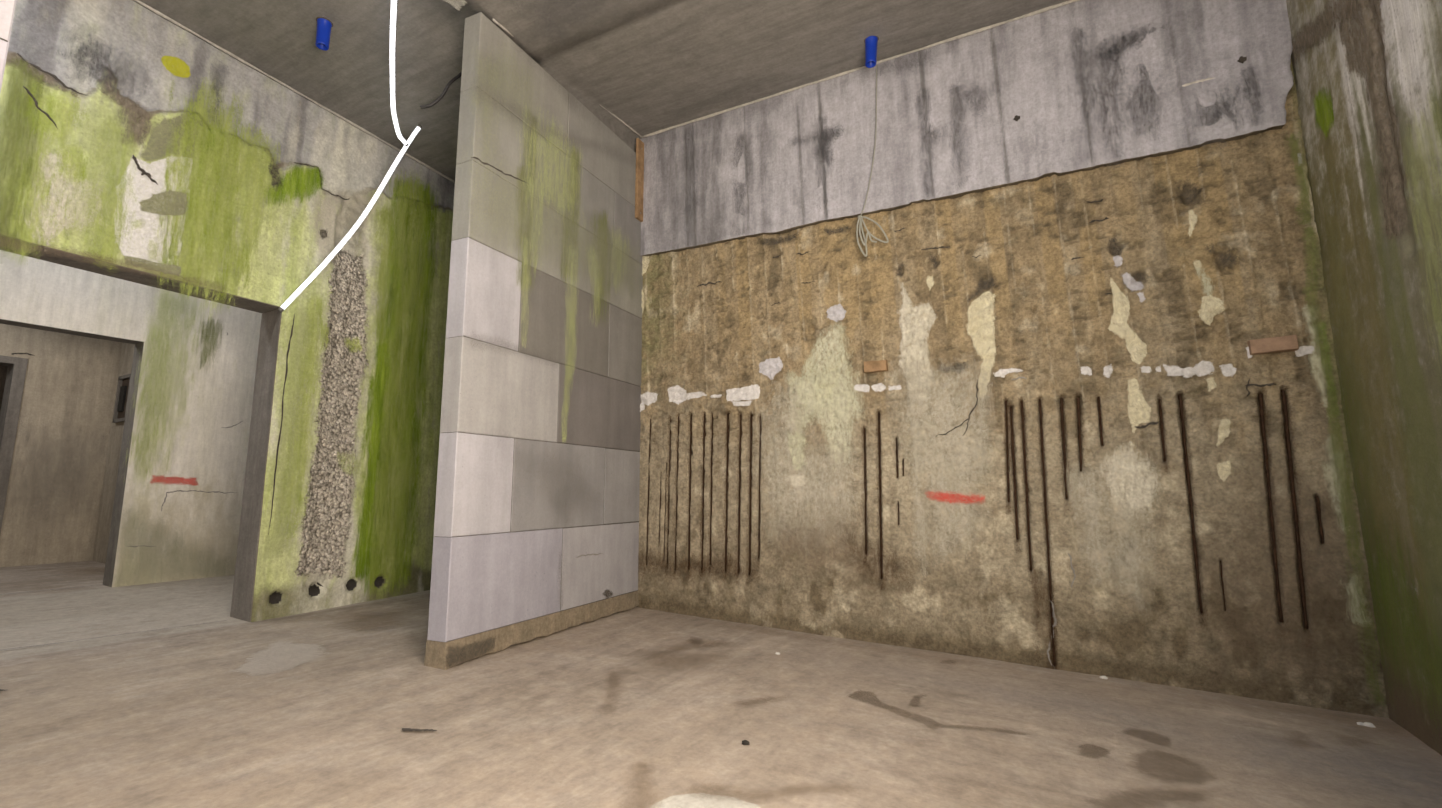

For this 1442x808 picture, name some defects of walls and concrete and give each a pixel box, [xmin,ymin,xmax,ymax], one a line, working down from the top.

damp [0,24,326,485]
damp [263,295,331,560]
spalling [294,187,377,579]
damp [327,167,439,633]
peeling [640,256,1104,669]
damp [875,46,1002,200]
damp [1070,21,1165,167]
peeling [1080,237,1252,629]
peeling [1173,178,1245,325]
damp [1058,133,1407,707]
spalling [1255,384,1350,649]
peeling [1295,304,1328,417]